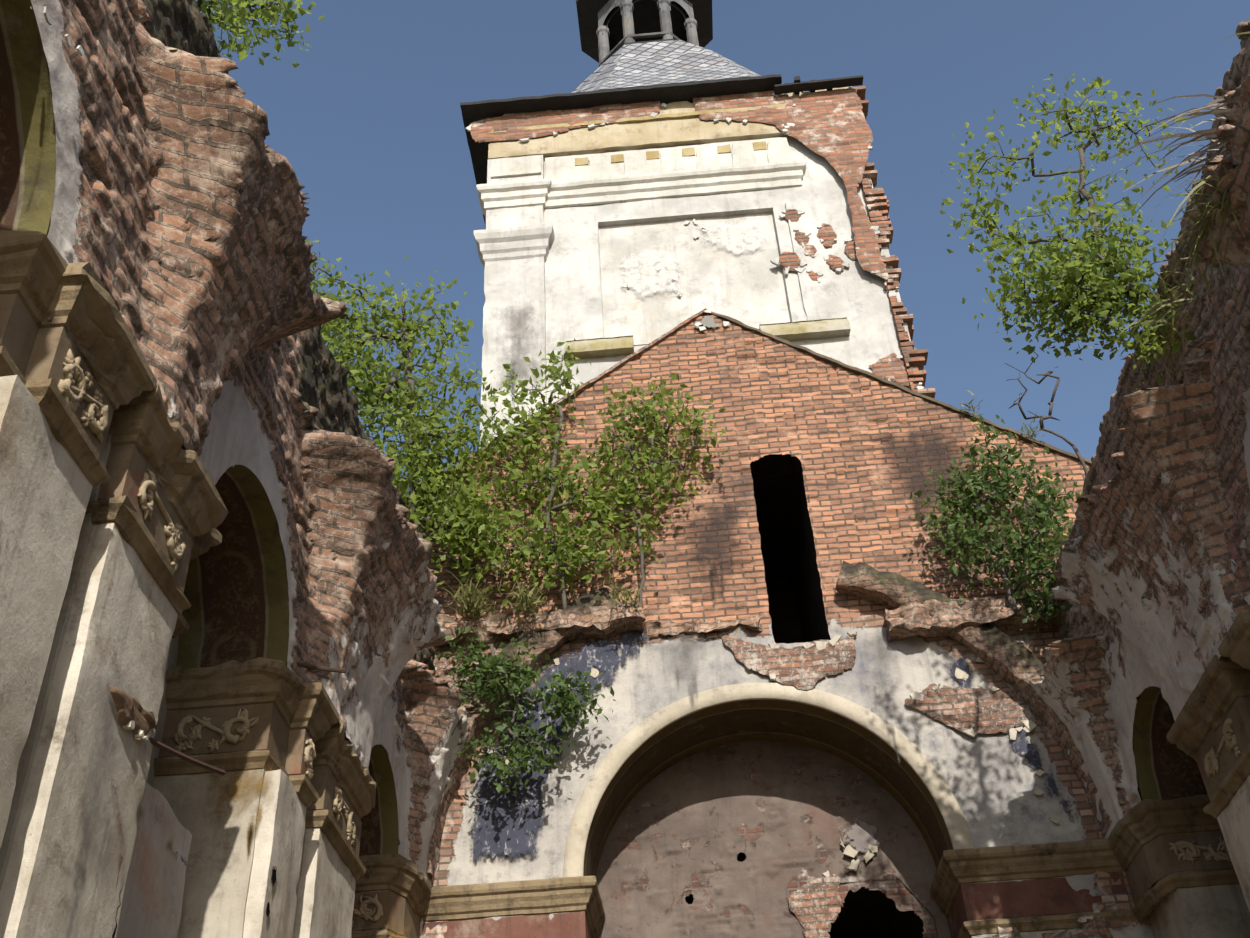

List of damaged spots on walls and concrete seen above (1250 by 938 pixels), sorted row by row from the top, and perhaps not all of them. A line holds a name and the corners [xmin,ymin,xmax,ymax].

flaking render [465,101,667,143]
flaking render [684,86,936,398]
flaking render [722,630,857,690]
flaking render [108,683,158,741]
flaking render [905,657,1077,824]
flaking render [788,815,884,938]
flaking render [990,926,1023,938]